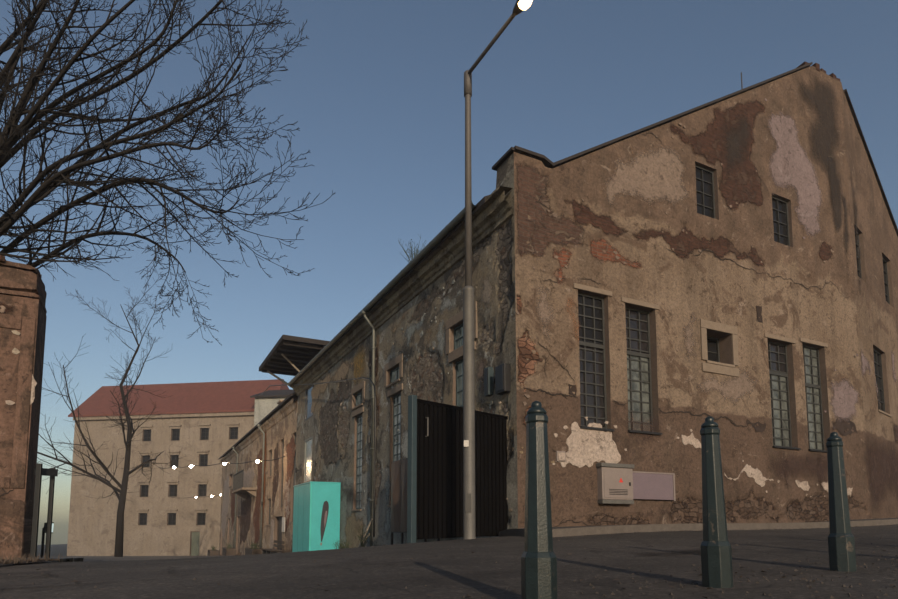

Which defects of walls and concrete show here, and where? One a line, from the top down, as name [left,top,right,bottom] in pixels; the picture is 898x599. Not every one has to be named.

flaking render [606,98,834,263]
flaking render [401,165,764,403]
flaking render [311,343,379,468]
flaking render [518,330,543,426]
flaking render [551,417,627,468]
flaking render [677,429,701,448]
flaking render [221,437,296,549]
flaking render [670,497,703,524]
flaking render [724,460,829,522]